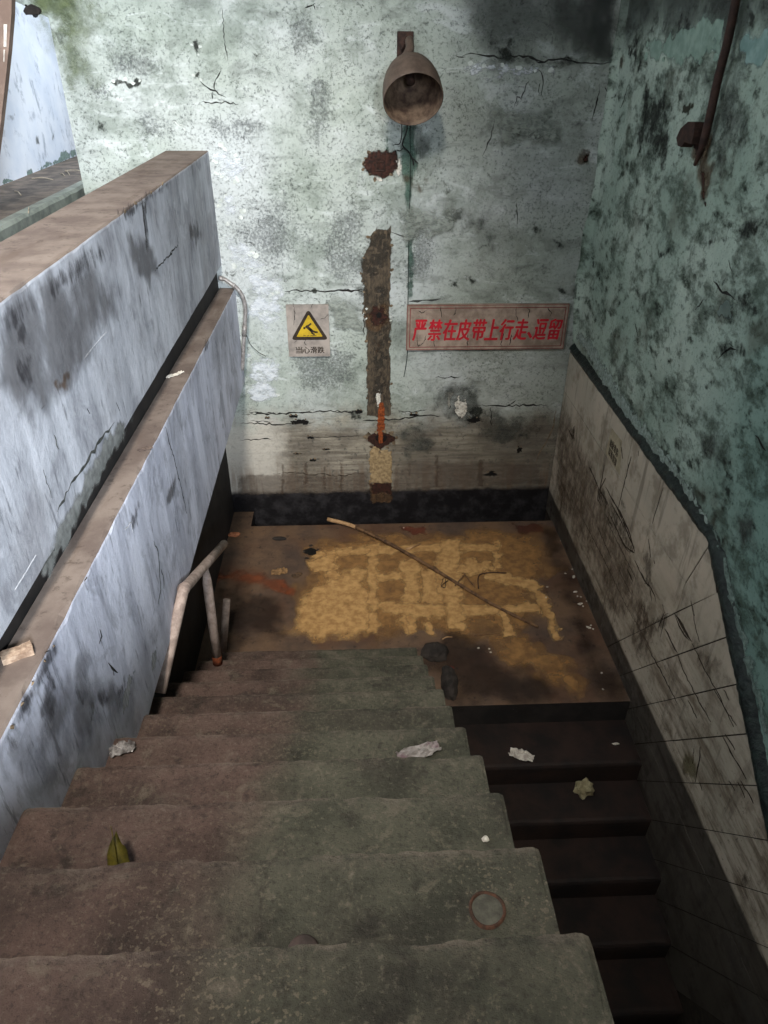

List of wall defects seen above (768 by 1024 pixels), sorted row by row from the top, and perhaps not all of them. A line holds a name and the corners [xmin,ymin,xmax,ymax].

flaking render [111,76,142,89]
crack [200,10,237,105]
crack [457,53,628,175]
mould [637,87,669,168]
rust [361,150,409,182]
mould [739,220,768,251]
crack [284,287,365,337]
rust [363,305,392,352]
rust [376,393,385,444]
water stain [438,387,527,443]
crack [43,402,120,512]
water stain [570,333,768,733]